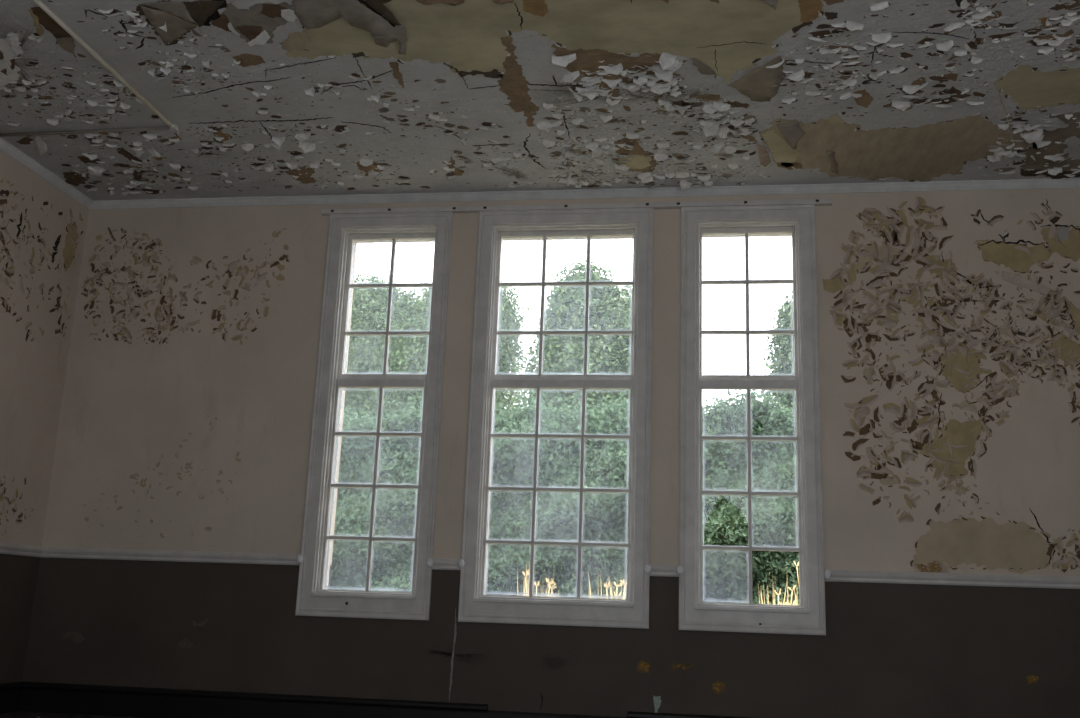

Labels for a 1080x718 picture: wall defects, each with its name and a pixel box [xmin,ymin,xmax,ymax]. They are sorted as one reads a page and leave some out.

peeling [0,0,1080,196]
peeling [0,178,291,346]
peeling [822,196,1080,574]